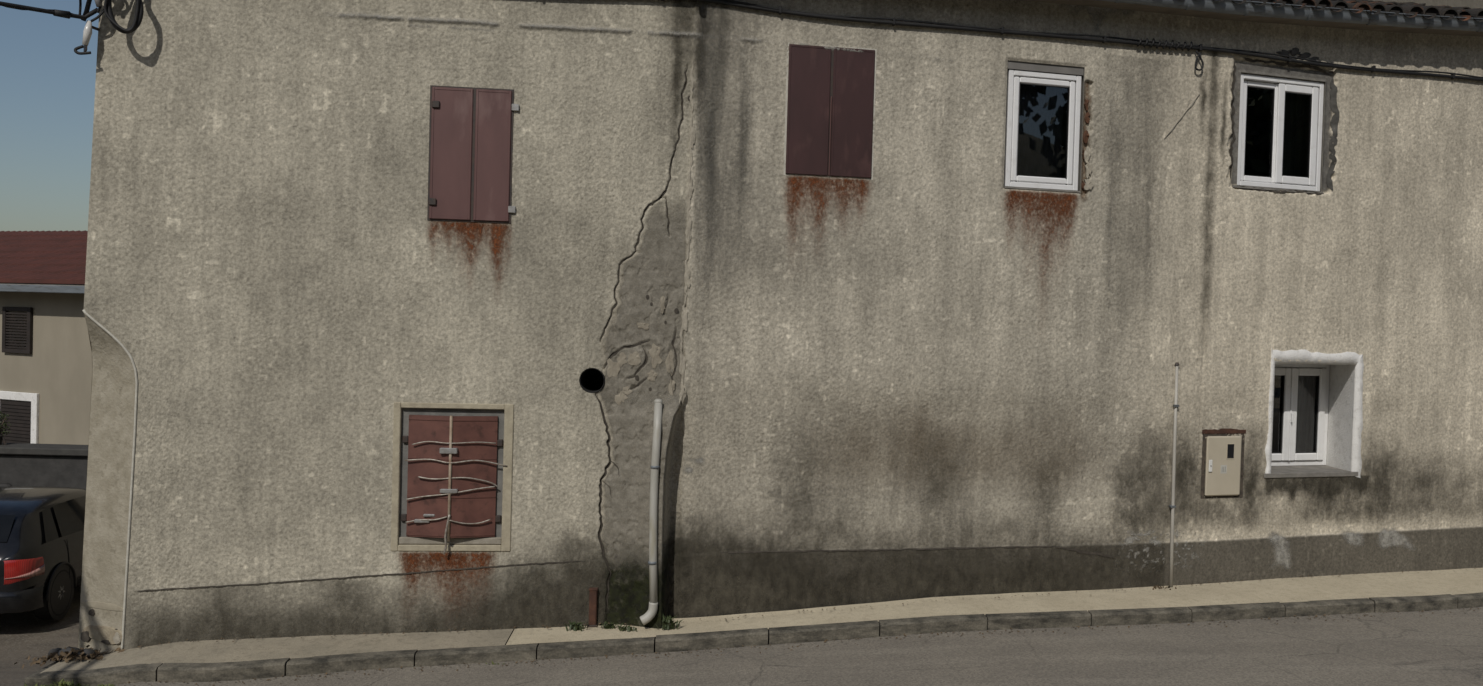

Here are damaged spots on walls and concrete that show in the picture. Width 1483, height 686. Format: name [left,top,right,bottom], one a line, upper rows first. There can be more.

rust [430,222,507,265]
crack [600,69,687,341]
flaking render [601,60,696,406]
rust [787,177,867,221]
rust [1007,191,1076,252]
leakage [1178,460,1410,518]
rust [402,552,491,596]
leakage [657,537,1164,618]